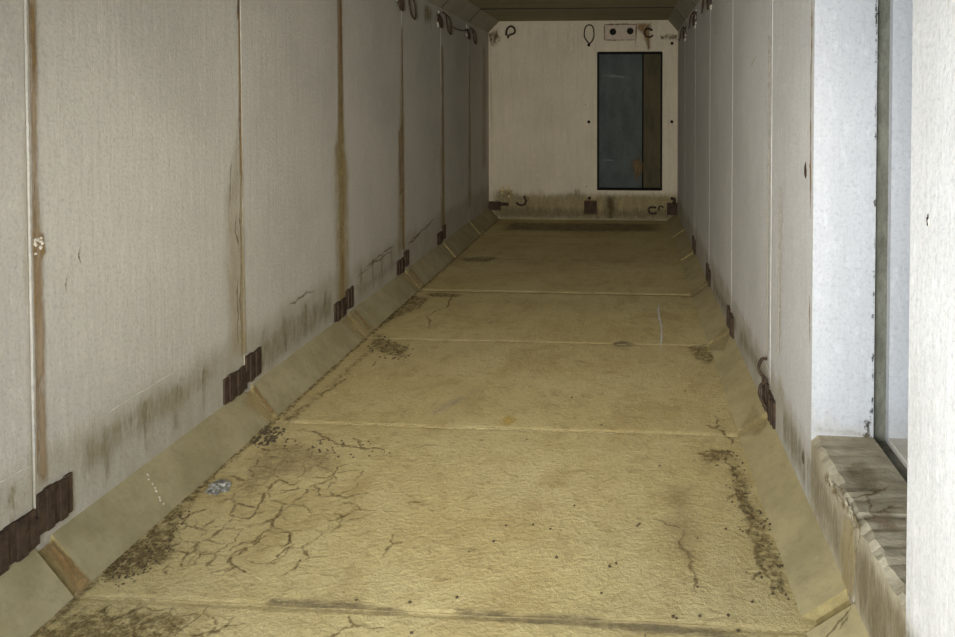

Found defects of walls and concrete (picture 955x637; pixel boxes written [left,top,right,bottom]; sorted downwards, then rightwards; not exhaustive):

rust [29,0,47,480]
rust [336,0,347,300]
crack [141,429,384,577]
leakage [30,192,674,637]
crack [653,519,698,594]